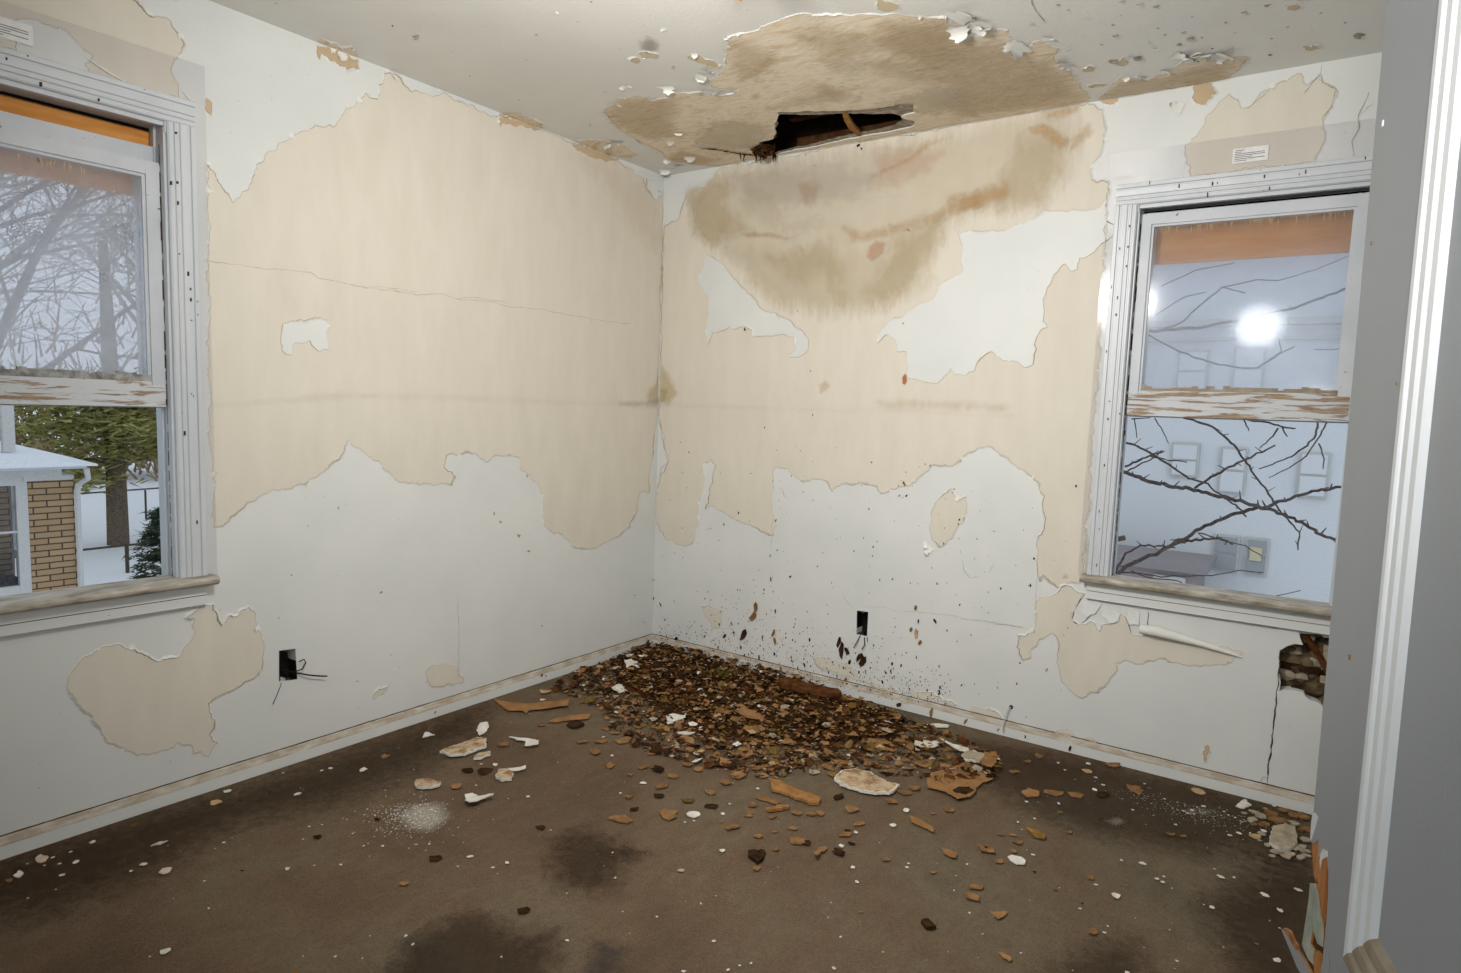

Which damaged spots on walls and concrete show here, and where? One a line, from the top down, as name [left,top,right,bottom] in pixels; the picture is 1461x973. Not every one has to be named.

peeling [0,0,187,98]
peeling [204,0,1340,704]
peeling [65,603,265,758]
peeling [813,656,1004,719]